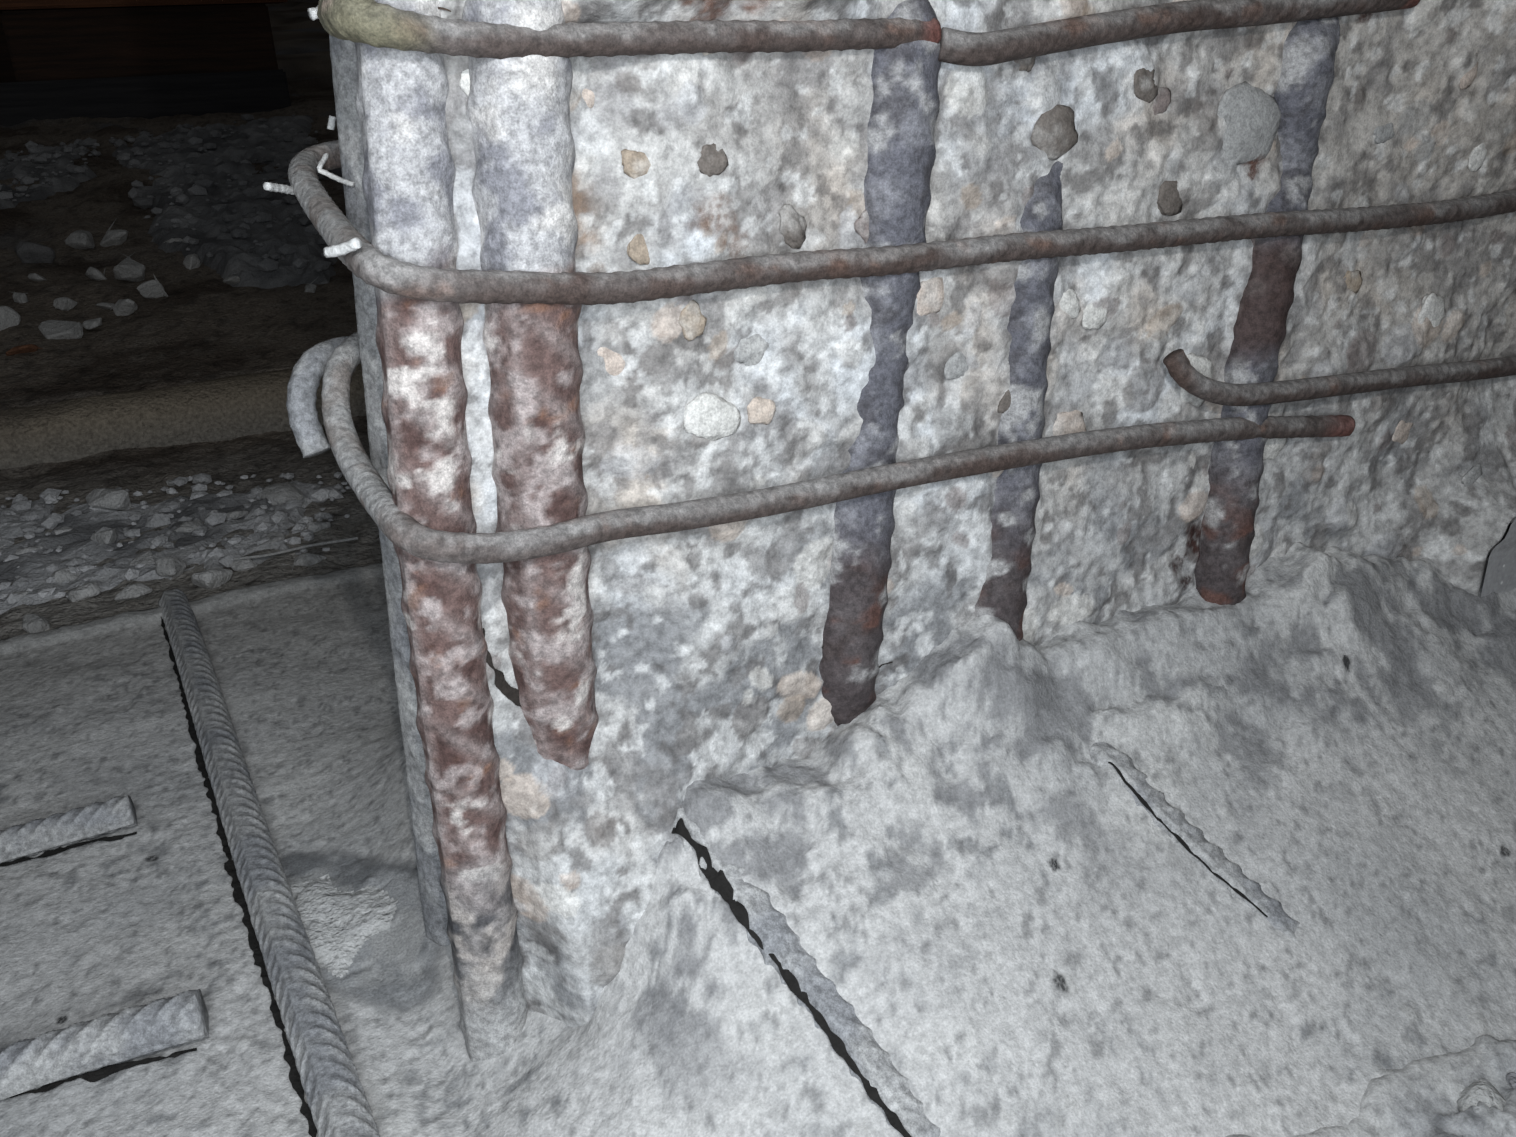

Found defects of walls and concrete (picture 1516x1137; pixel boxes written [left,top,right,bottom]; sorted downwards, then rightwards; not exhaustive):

spalling [570,49,874,273]
spalling [925,22,1297,243]
spalling [1308,0,1516,210]
spalling [578,277,876,515]
spalling [1042,238,1256,438]
rust [1172,524,1201,588]
crack [0,832,137,867]
crack [6,1048,197,1099]
crack [161,617,317,1137]
spalling [476,502,838,1027]
crack [672,818,912,1137]
crack [1108,762,1268,917]